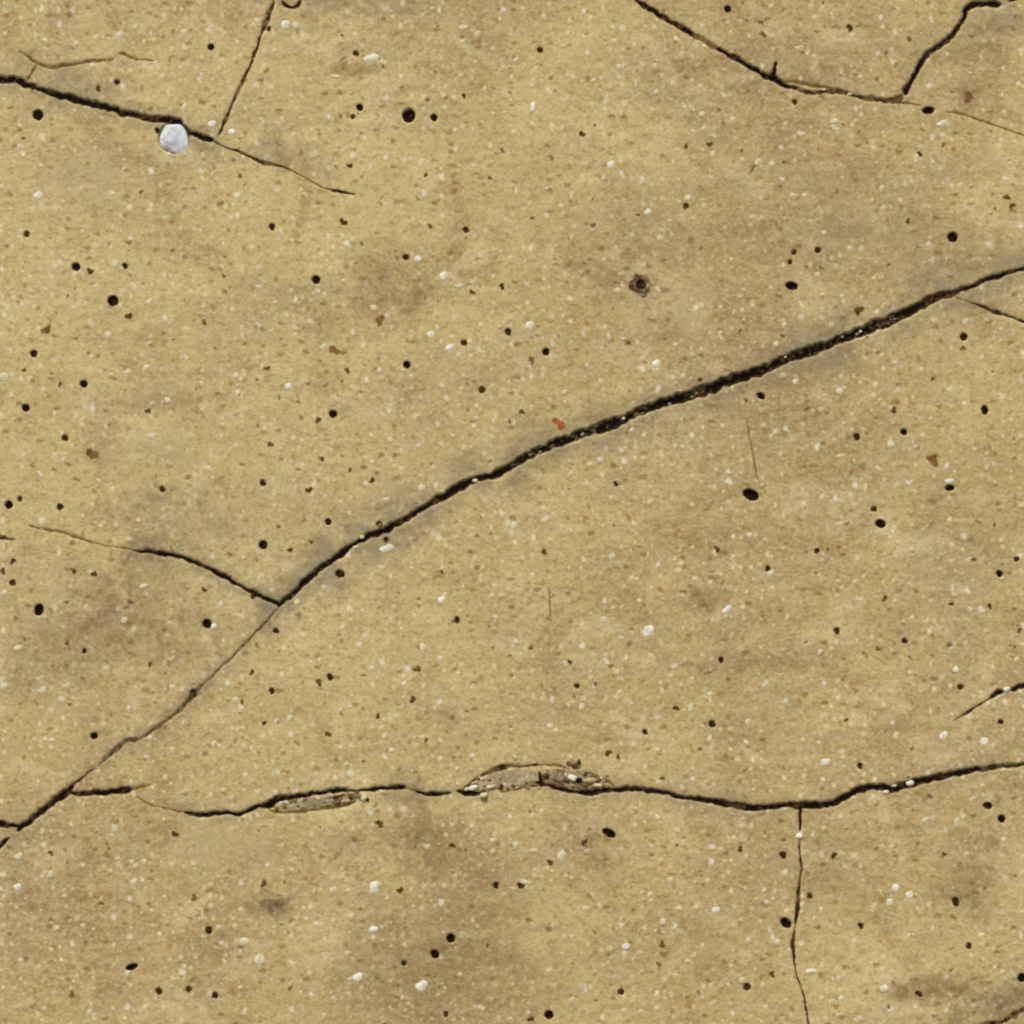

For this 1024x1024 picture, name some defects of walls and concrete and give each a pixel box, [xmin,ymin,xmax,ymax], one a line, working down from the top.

crack [0,0,355,195]
crack [635,0,1016,106]
crack [946,111,1024,136]
crack [0,267,1024,1024]